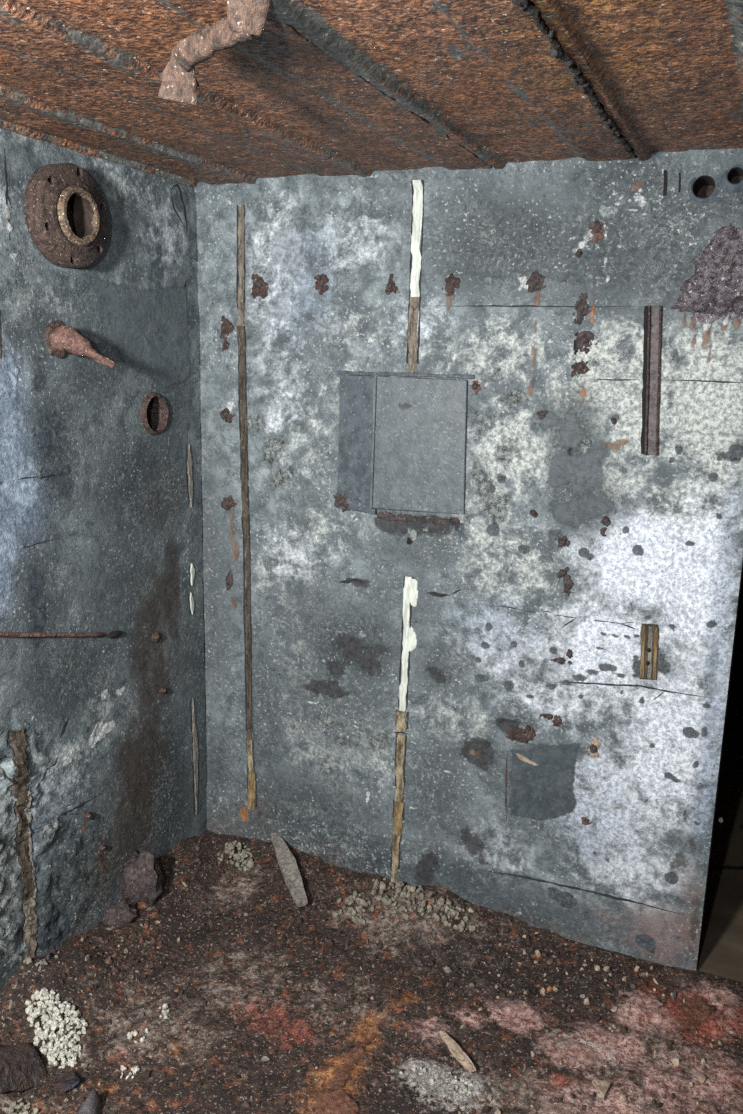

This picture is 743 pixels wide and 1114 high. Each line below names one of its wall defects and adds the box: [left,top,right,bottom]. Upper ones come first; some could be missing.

corrosion [682,312,743,361]
crack [0,474,56,484]